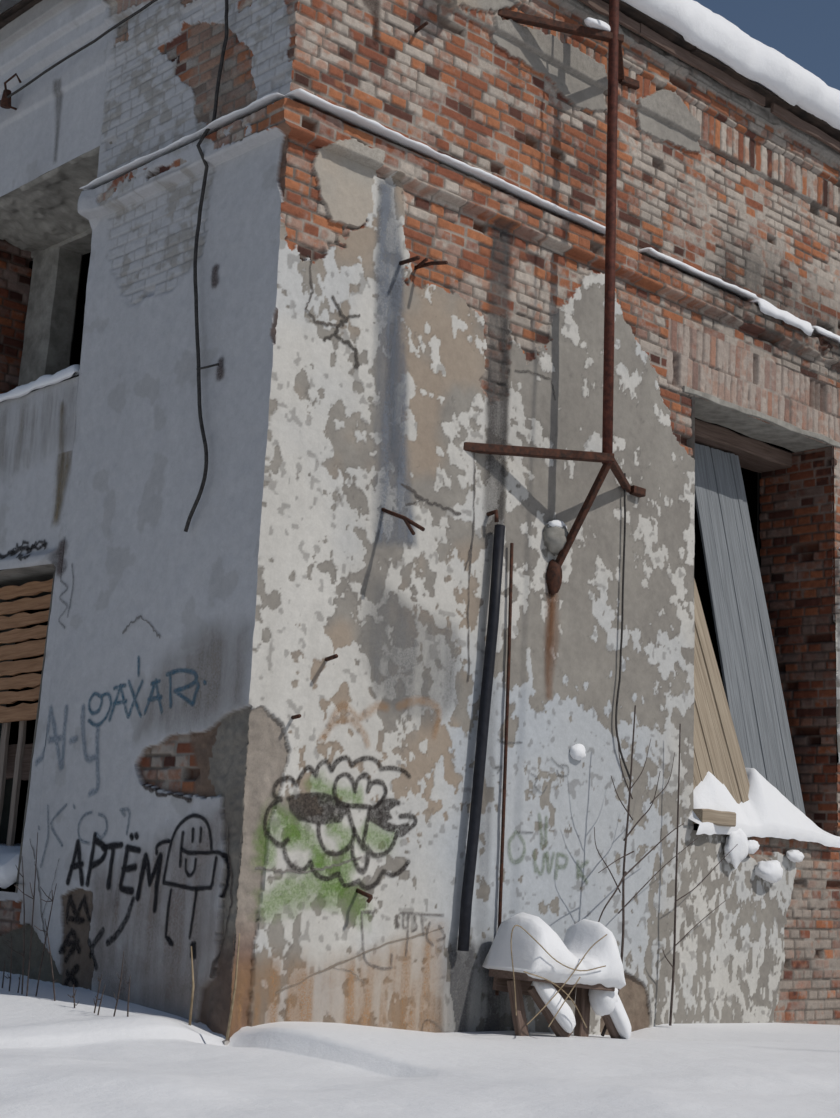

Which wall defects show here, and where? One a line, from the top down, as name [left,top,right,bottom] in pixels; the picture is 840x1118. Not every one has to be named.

crack [305,255,360,369]
leakage [377,182,415,543]
flaking render [96,0,840,781]
rust [546,595,555,658]
peeling [401,184,840,1032]
flaking render [0,887,94,990]
flaking render [134,705,291,1040]